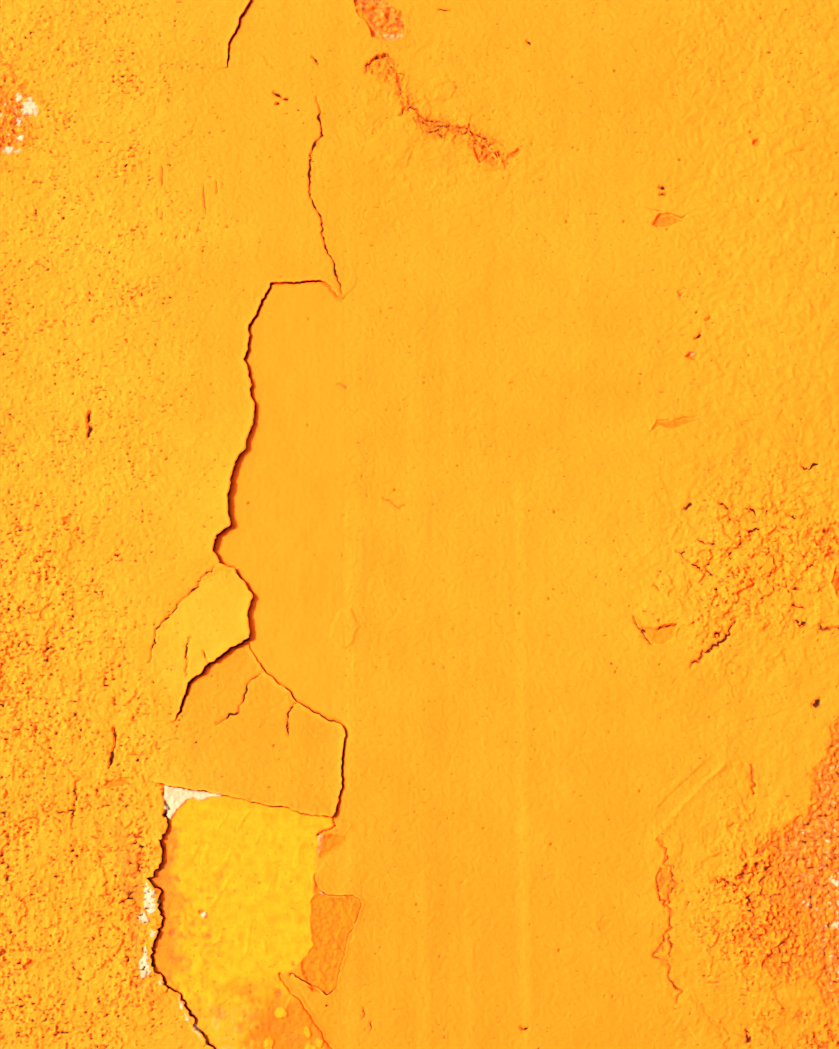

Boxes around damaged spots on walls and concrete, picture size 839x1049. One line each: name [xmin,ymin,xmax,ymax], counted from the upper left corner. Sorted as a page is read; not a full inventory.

crack [222,0,251,68]
crack [274,92,289,106]
crack [306,97,342,293]
spalling [355,0,405,40]
peeling [362,53,520,171]
peeling [634,459,839,676]
peeling [138,785,365,1049]
peeling [659,716,839,1049]